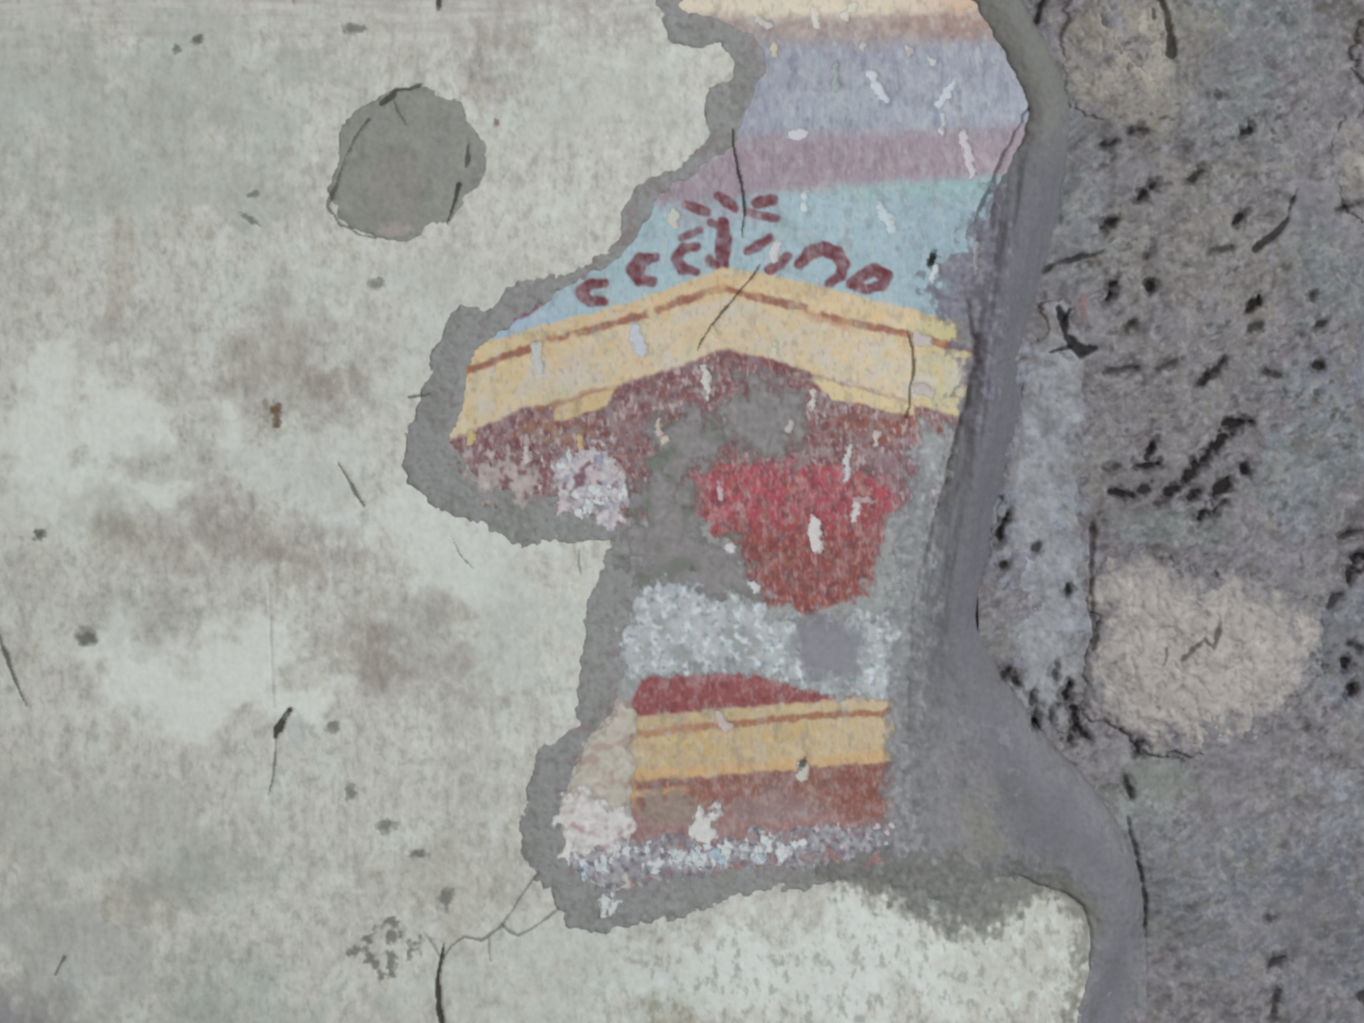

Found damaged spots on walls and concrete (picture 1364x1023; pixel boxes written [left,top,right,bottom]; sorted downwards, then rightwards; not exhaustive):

peeling [865,70,890,104]
peeling [786,128,809,140]
peeling [934,77,977,179]
crack [732,129,746,233]
peeling [530,342,544,374]
peeling [629,323,648,357]
crack [698,265,760,349]
peeling [769,240,782,263]
peeling [929,264,939,283]
spalling [458,365,957,703]
spalling [552,699,895,918]
crack [435,947,444,1023]